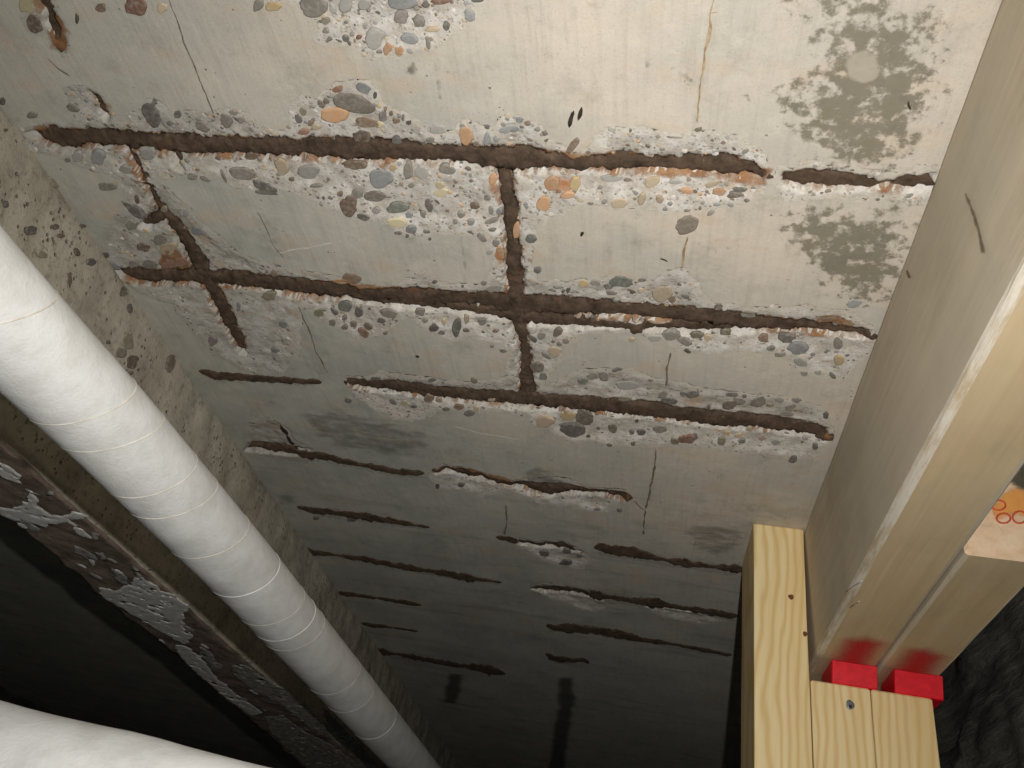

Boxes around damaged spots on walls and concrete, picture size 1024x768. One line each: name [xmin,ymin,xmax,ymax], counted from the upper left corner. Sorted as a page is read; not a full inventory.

spalling [253,0,484,61]
crack [696,0,716,122]
leakage [778,0,934,171]
spalling [3,79,941,463]
leakage [781,199,911,308]
spalling [241,417,633,513]
peeling [0,463,377,768]
spalling [297,505,430,528]
spalling [338,591,422,606]
spalling [307,547,502,584]
spalling [496,535,742,575]